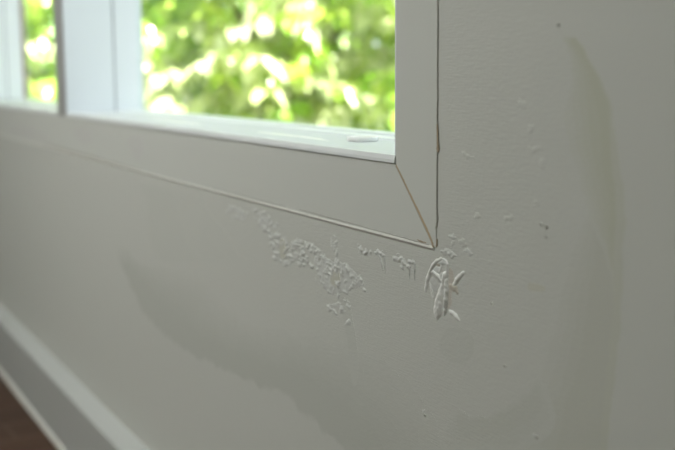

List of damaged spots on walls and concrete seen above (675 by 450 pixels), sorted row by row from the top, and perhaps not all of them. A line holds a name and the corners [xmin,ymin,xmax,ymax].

leakage [117,35,626,450]
peeling [424,257,465,322]